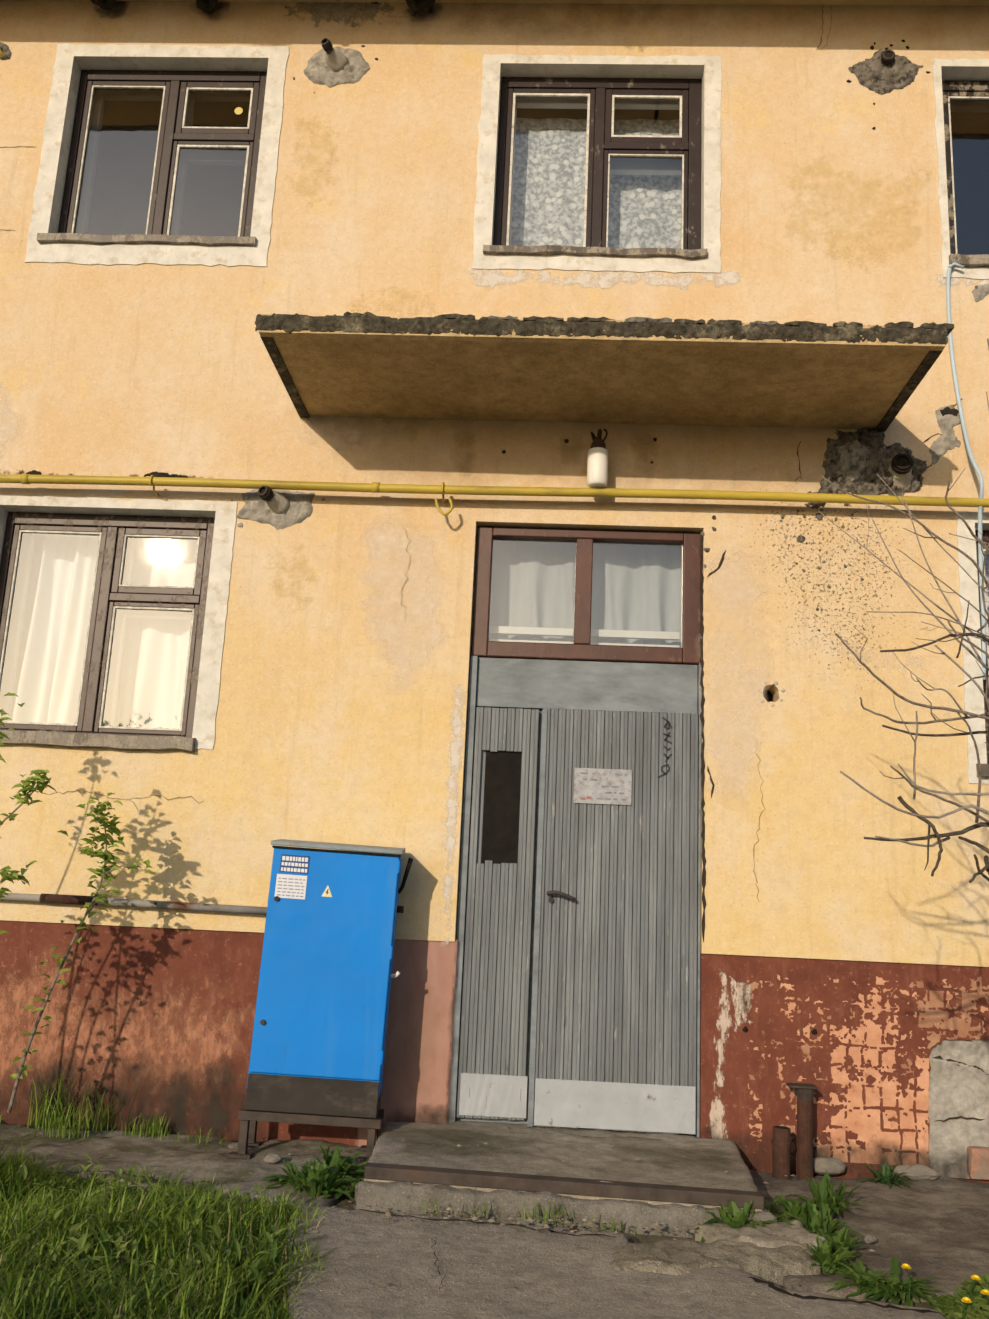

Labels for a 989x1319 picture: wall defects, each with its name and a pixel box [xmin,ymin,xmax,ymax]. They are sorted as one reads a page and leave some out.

spalling [255,311,954,346]
flaking render [972,284,989,302]
flaking render [801,405,961,521]
crack [401,528,411,622]
crack [31,790,204,812]
crack [753,754,765,900]
peeling [709,972,989,1181]
crack [748,1277,939,1313]